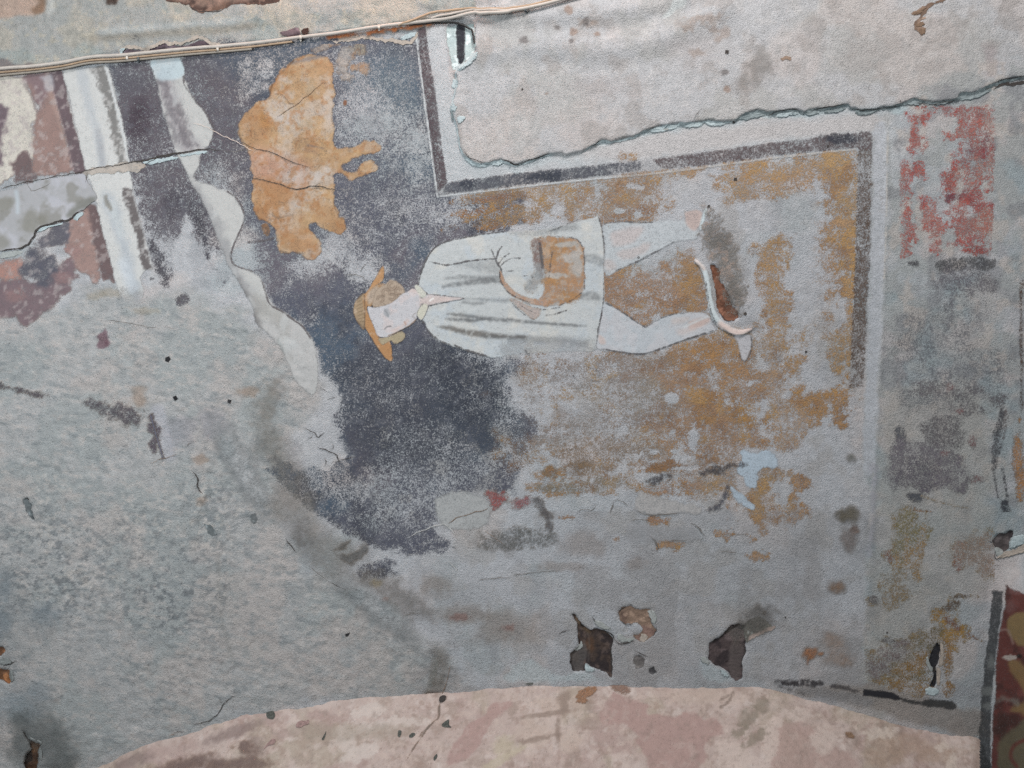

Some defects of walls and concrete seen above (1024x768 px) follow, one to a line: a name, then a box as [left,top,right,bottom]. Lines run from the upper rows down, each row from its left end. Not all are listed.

spalling [166,0,280,13]
spalling [446,24,550,168]
crack [995,76,1024,89]
crack [1,123,335,191]
crack [3,210,85,251]
spalling [991,530,1024,566]
spalling [561,604,657,677]
spalling [700,611,776,681]
spalling [925,643,944,696]